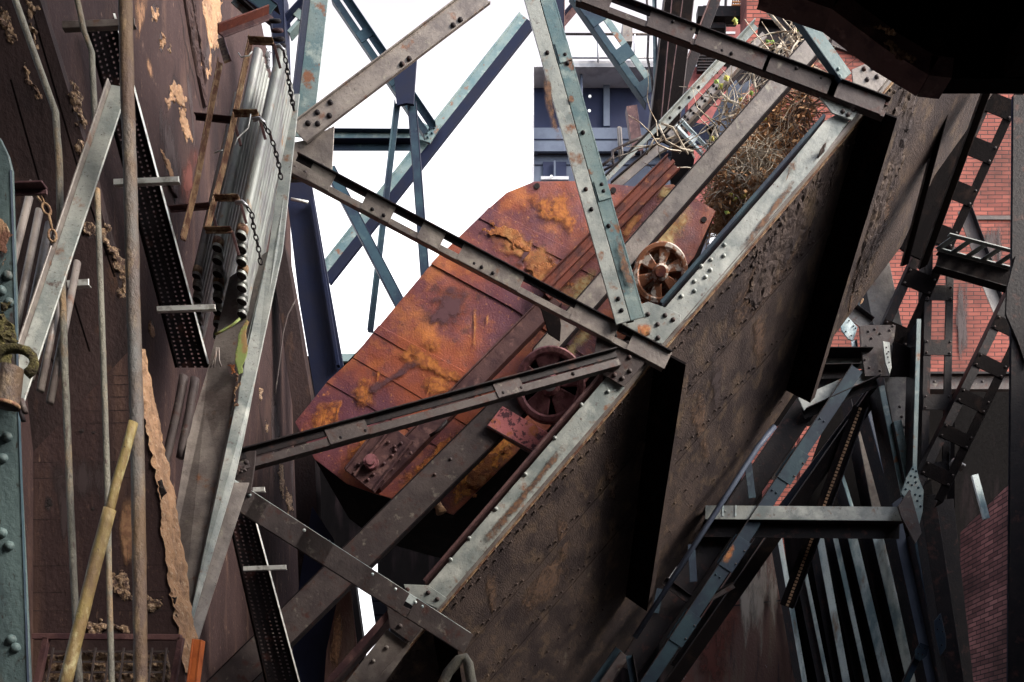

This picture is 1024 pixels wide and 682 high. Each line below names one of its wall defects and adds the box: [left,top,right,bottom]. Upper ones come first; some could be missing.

spalling [151,4,172,54]
spalling [201,0,223,78]
spalling [165,77,193,143]
rust [523,194,576,232]
rust [504,234,553,266]
rust [617,214,642,285]
rust [427,286,488,344]
rust [352,345,461,404]
rust [313,401,342,428]
rust [453,439,513,503]
rust [485,447,565,548]